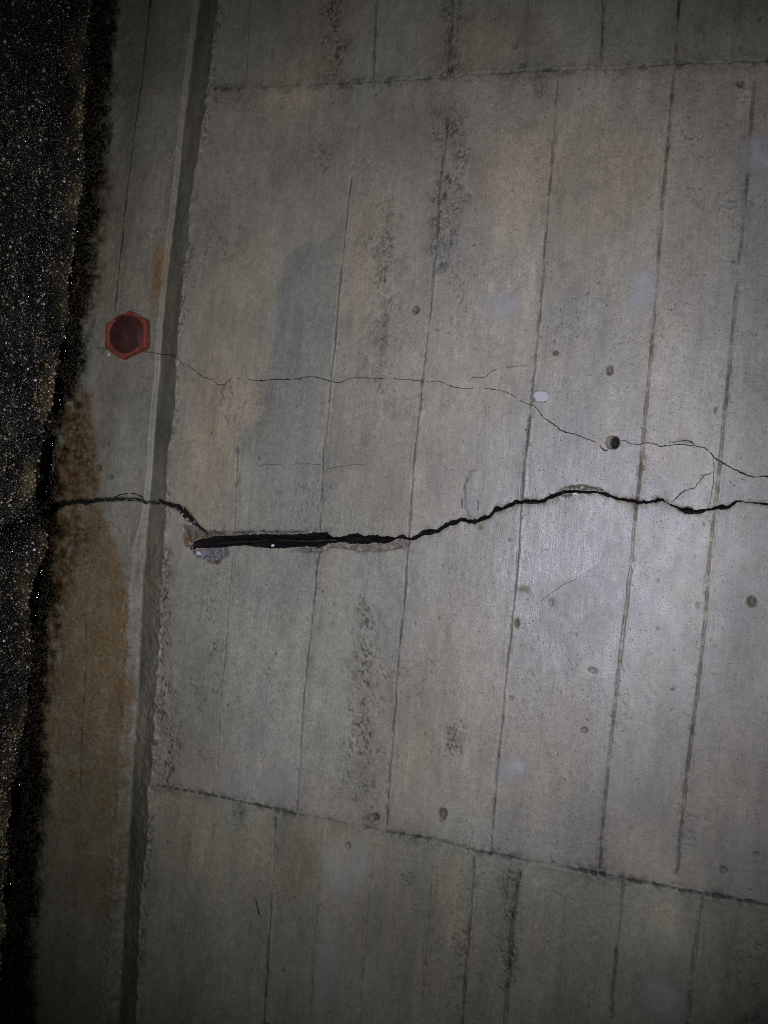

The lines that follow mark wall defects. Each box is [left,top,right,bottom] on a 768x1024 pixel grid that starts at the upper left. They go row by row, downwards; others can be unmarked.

spalling [183,524,229,564]
crack [40,351,768,553]